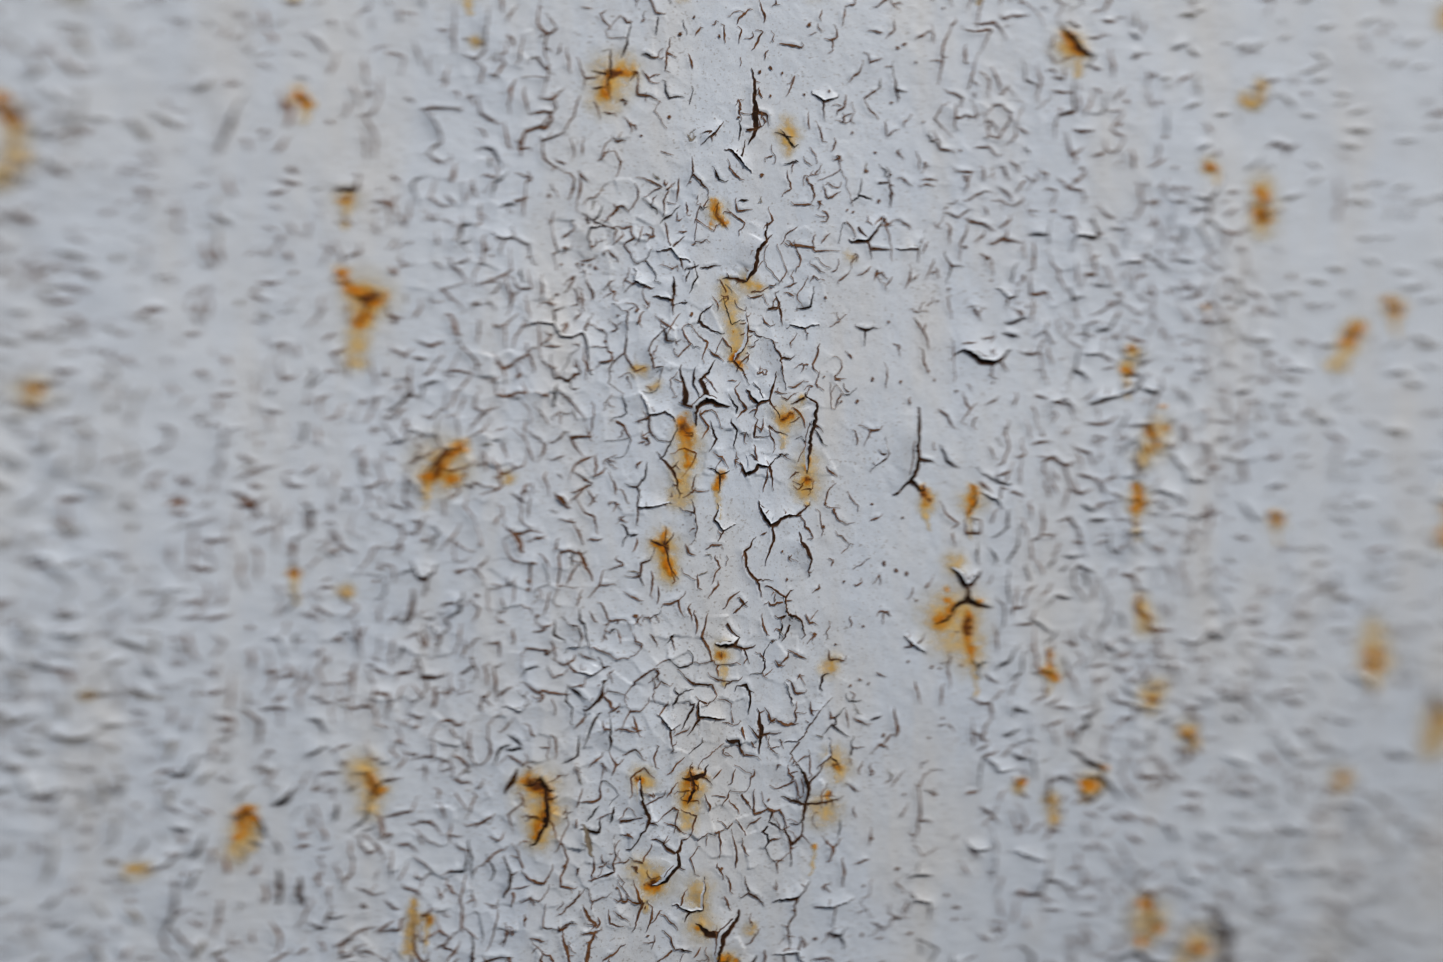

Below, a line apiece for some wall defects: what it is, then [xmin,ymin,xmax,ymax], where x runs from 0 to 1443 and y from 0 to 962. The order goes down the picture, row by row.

crack [682,0,856,58]
crack [629,38,694,128]
crack [849,52,911,138]
crack [765,89,872,222]
rust [1252,176,1275,235]
rust [335,269,387,369]
rust [419,440,468,510]
rust [668,413,698,506]
crack [853,398,959,495]
crack [722,591,748,613]
rust [925,555,985,696]
rust [518,772,561,849]